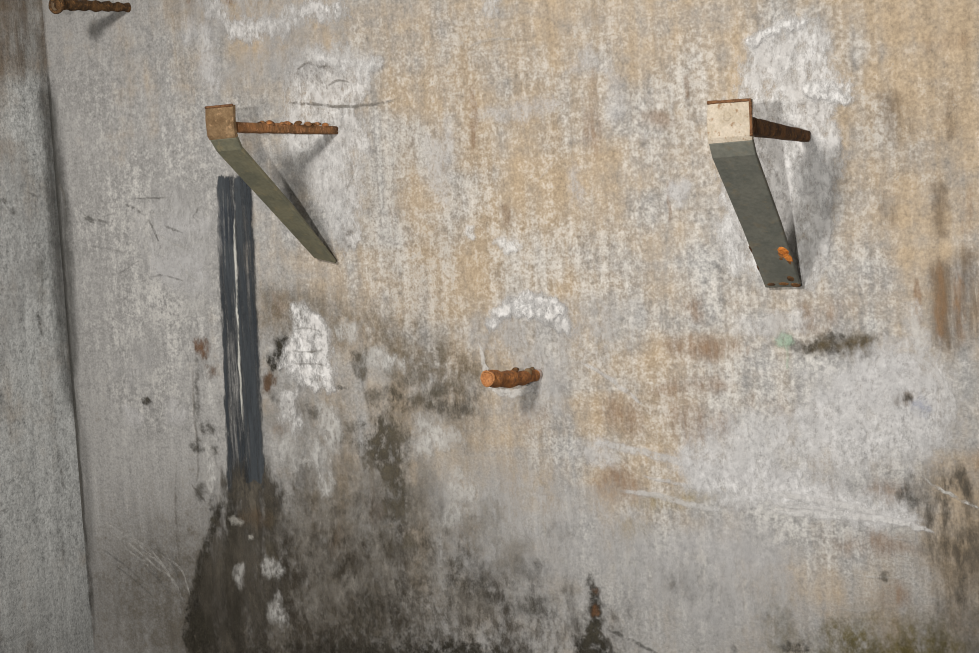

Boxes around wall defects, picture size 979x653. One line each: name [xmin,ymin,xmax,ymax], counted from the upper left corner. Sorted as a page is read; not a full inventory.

water stain [268,338,285,371]
water stain [182,411,532,653]
water stain [574,579,618,653]